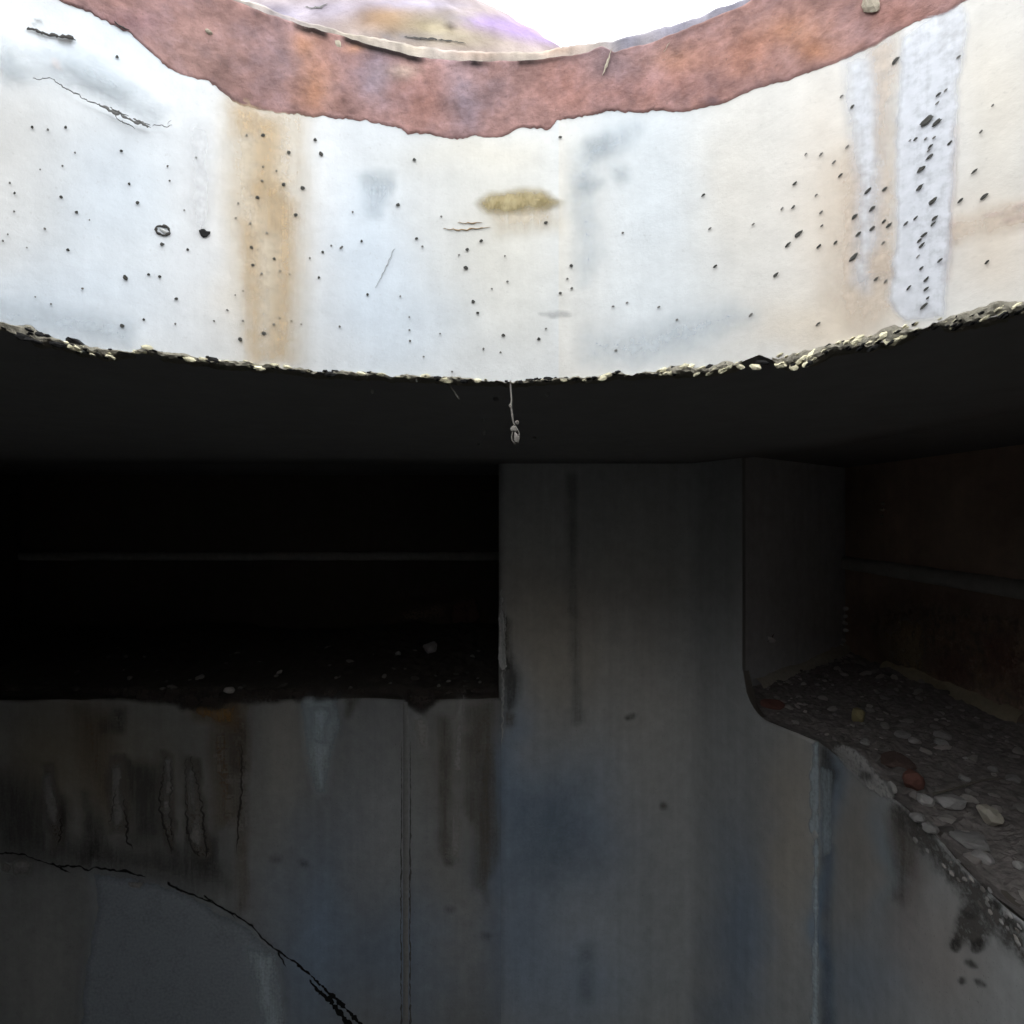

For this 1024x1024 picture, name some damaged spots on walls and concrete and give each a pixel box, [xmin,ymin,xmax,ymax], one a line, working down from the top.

crack [35,77,170,129]
rust [241,121,287,356]
spalling [0,197,1024,388]
efflorescence [850,51,881,278]
hole [908,88,948,191]
efflorescence [892,9,965,319]
crack [0,852,363,1024]